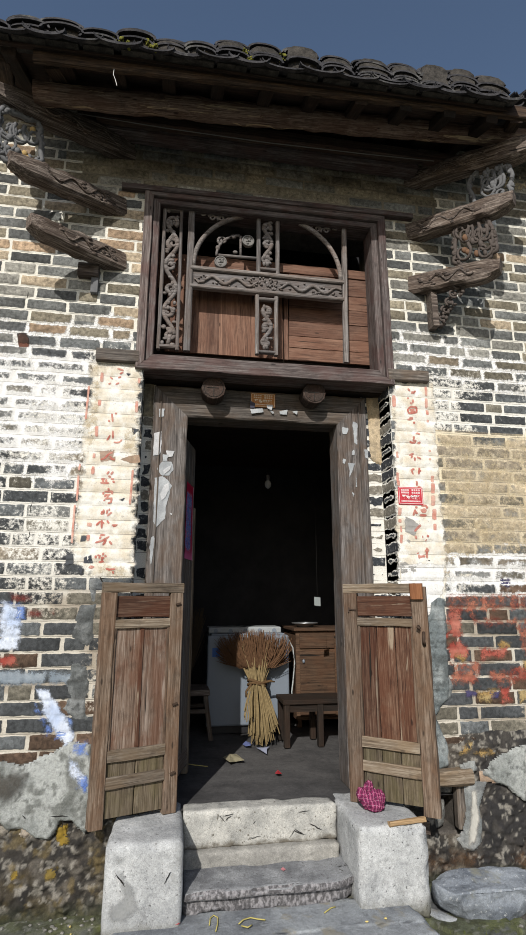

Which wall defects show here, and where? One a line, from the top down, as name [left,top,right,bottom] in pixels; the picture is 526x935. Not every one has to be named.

peeling [0,312,143,578]
peeling [391,329,526,617]
flaking render [0,741,91,840]